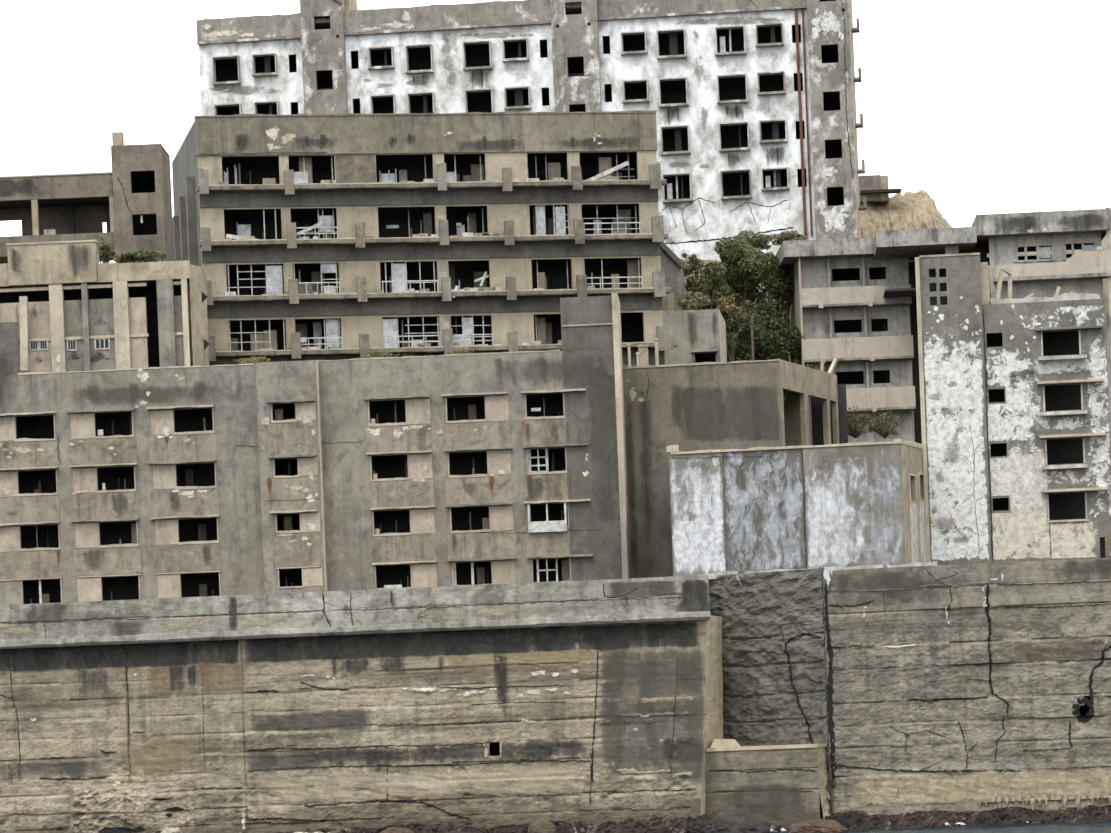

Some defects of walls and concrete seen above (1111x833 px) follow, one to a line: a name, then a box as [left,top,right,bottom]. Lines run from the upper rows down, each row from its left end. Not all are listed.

crack [659,198,793,244]
spalling [283,468,318,503]
leakage [626,403,650,505]
leakage [672,387,779,440]
peeling [924,304,1111,608]
leakage [0,450,927,781]
crack [194,314,1111,822]